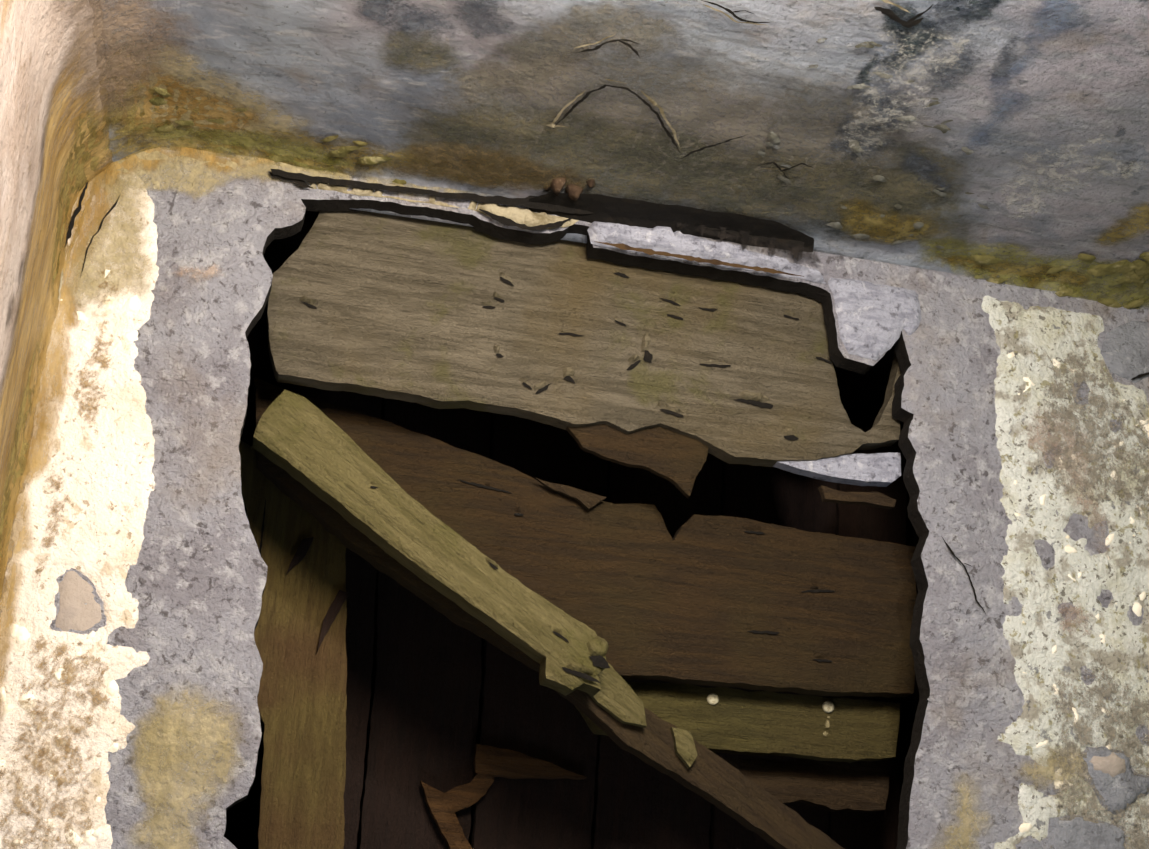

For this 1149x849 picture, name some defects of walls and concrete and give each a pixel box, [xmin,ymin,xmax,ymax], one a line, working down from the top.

crack [575,34,640,57]
crack [546,79,748,159]
leakage [361,0,1002,245]
crack [58,181,120,299]
leakage [699,224,820,262]
leakage [0,0,184,681]
spalling [627,350,653,370]
flaking render [828,278,922,361]
spalling [734,399,773,409]
crack [941,536,986,614]
spalling [562,655,610,683]
leakage [139,691,236,849]